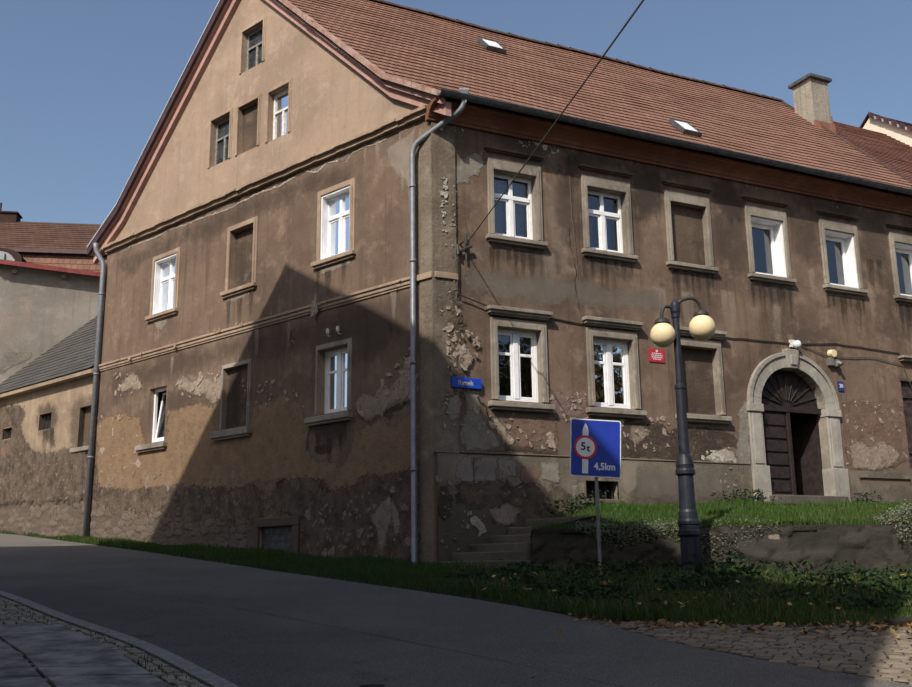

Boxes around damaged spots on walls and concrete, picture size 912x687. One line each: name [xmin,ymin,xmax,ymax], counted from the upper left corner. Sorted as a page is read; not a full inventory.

spalling [439,280,588,451]
spalling [0,347,421,564]
spalling [619,416,739,463]
flaking render [841,399,910,471]
spalling [436,466,573,551]